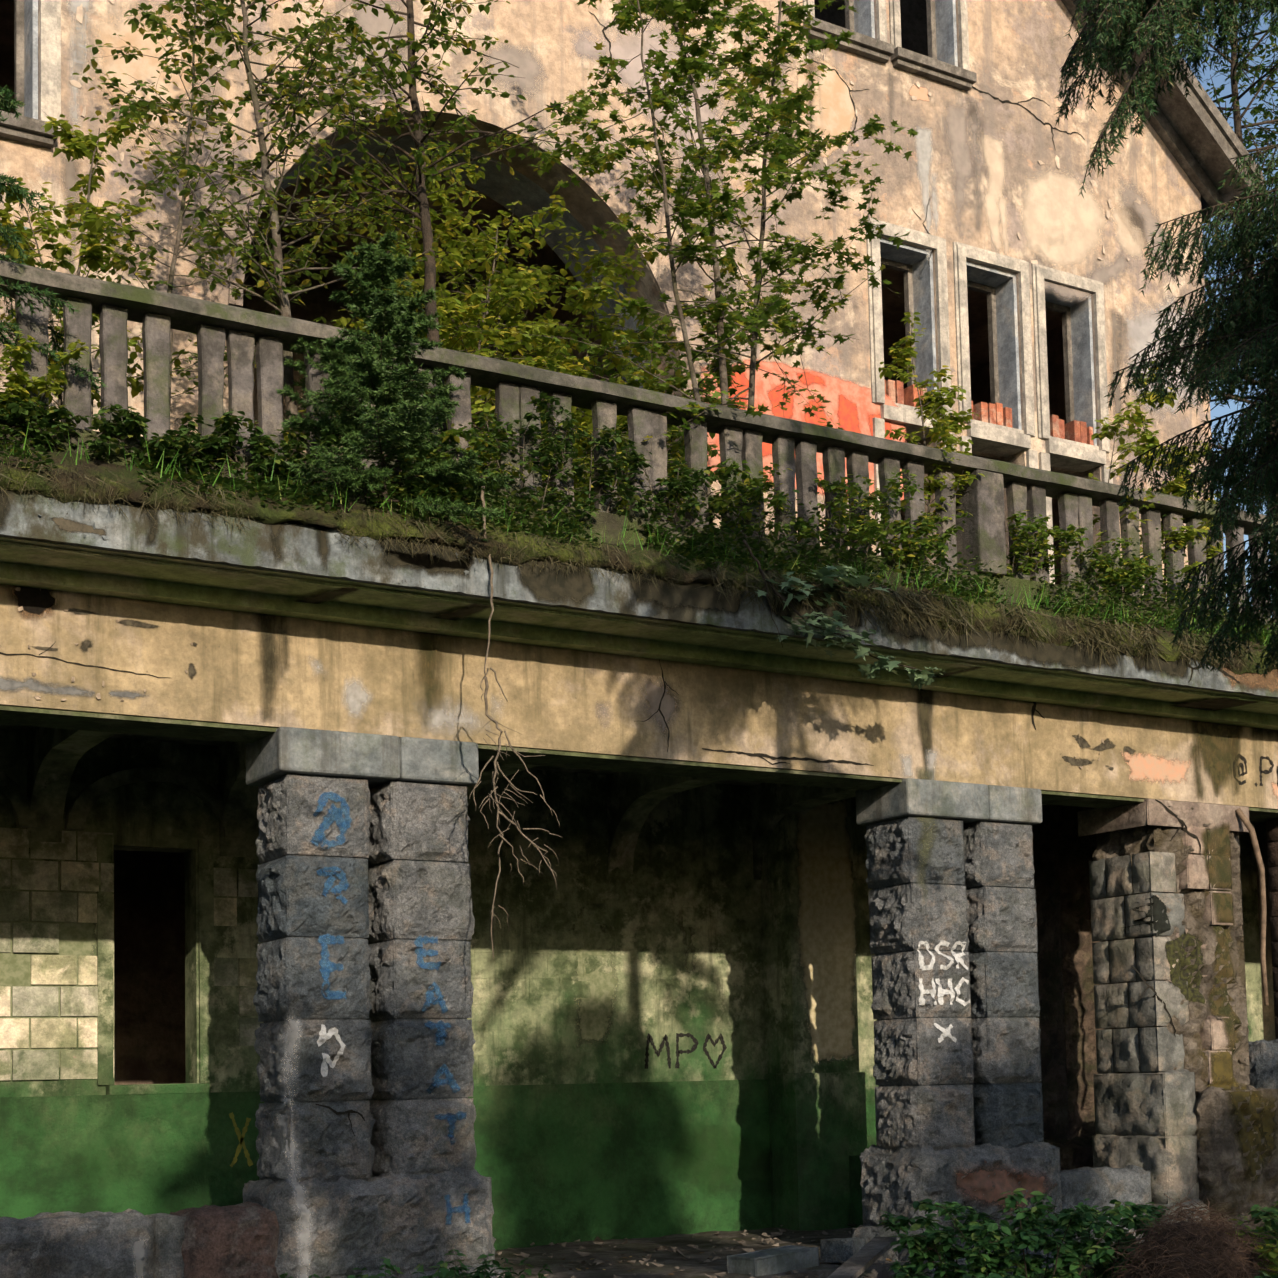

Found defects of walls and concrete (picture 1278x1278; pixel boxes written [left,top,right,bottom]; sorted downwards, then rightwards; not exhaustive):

crack [812,60,869,146]
crack [972,86,1085,150]
spalling [8,585,96,618]
spalling [0,673,147,702]
crack [0,644,168,678]
crack [642,659,679,752]
crack [702,748,874,766]
flaking render [1062,733,1191,784]
spalling [1123,823,1242,1056]
water stain [1199,1046,1278,1184]